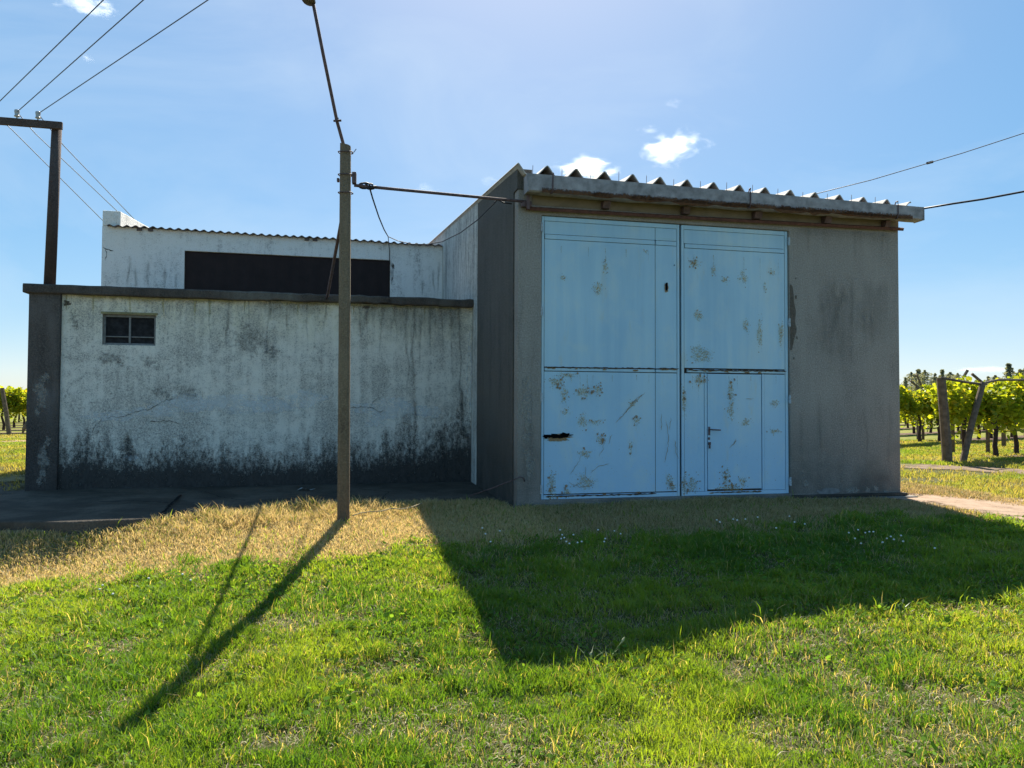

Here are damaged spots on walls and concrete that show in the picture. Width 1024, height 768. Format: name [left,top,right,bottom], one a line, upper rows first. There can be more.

water stain [37,391,471,489]
peeling [544,432,572,441]
corrosion [546,466,762,500]
corrosion [546,345,786,459]